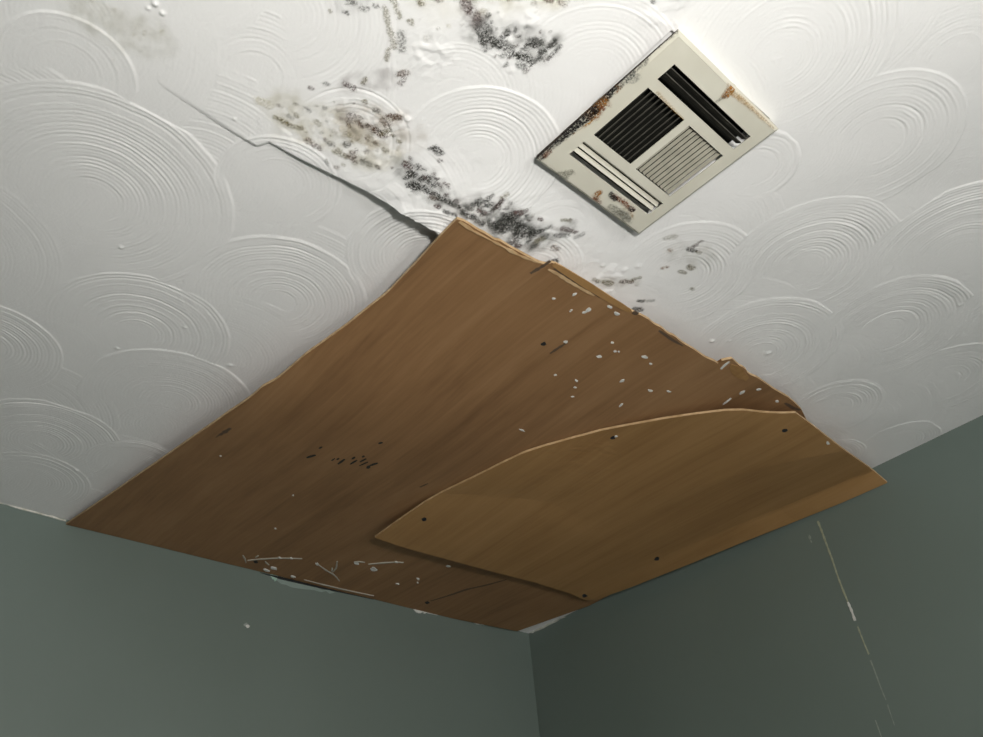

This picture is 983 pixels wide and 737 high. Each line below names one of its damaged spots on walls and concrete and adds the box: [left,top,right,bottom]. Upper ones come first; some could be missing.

water stain [481,15,560,69]
water stain [358,100,402,143]
water stain [402,161,577,248]
corrosion [594,190,635,212]
crack [817,521,895,737]